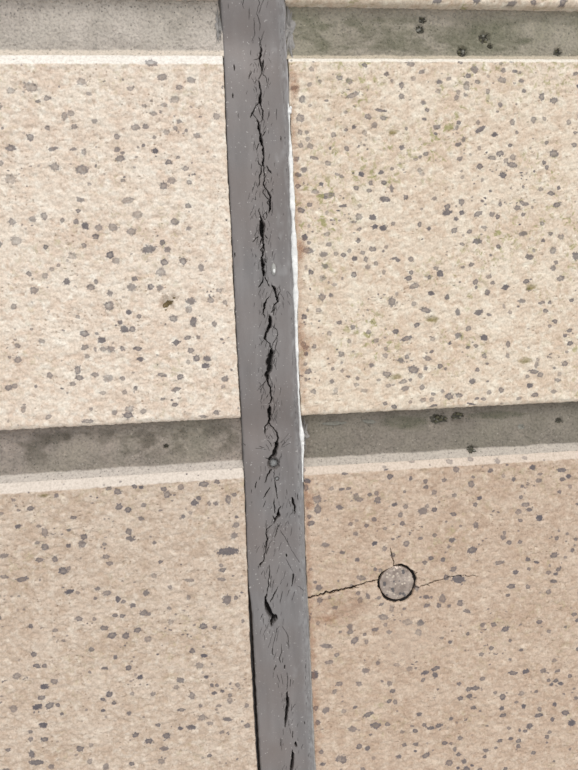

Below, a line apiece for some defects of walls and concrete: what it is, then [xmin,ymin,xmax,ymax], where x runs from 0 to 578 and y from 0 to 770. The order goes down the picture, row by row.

crack [238,0,375,770]